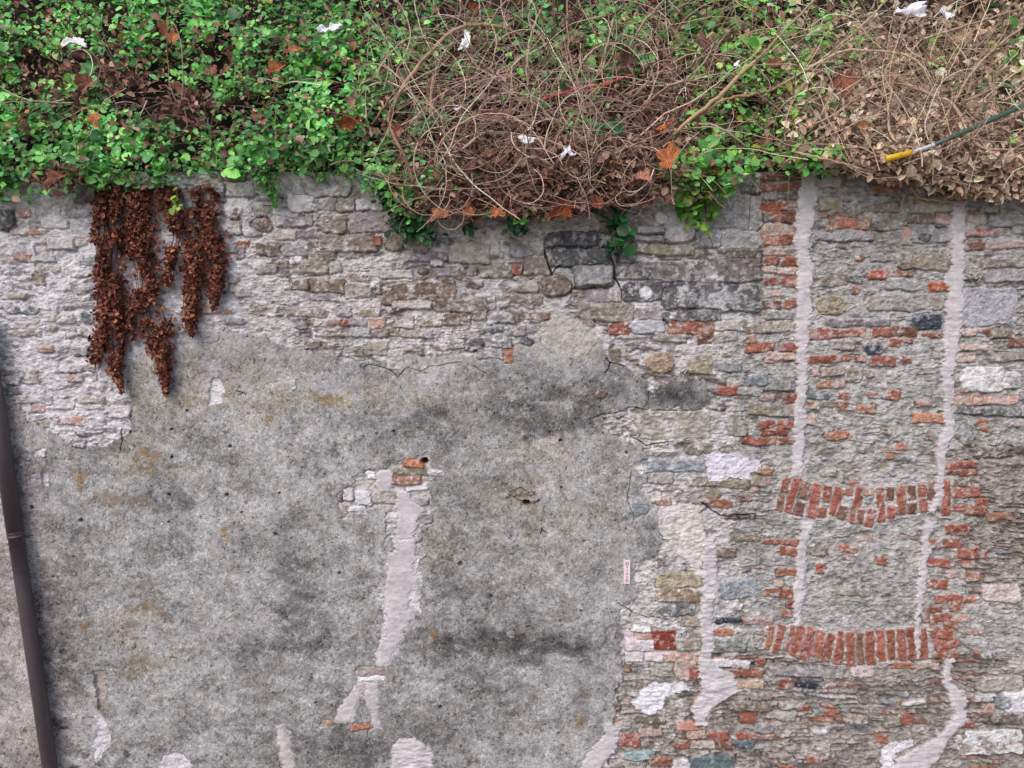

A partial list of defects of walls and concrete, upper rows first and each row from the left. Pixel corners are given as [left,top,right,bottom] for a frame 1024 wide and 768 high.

peeling [539,314,601,355]
crack [339,355,486,378]
peeling [209,377,225,405]
crack [590,391,710,447]
peeling [703,450,761,481]
spalling [507,487,541,508]
spalling [337,452,446,613]
peeling [657,502,706,576]
spalling [615,623,678,664]
peeling [630,681,690,715]
peeling [880,739,914,768]